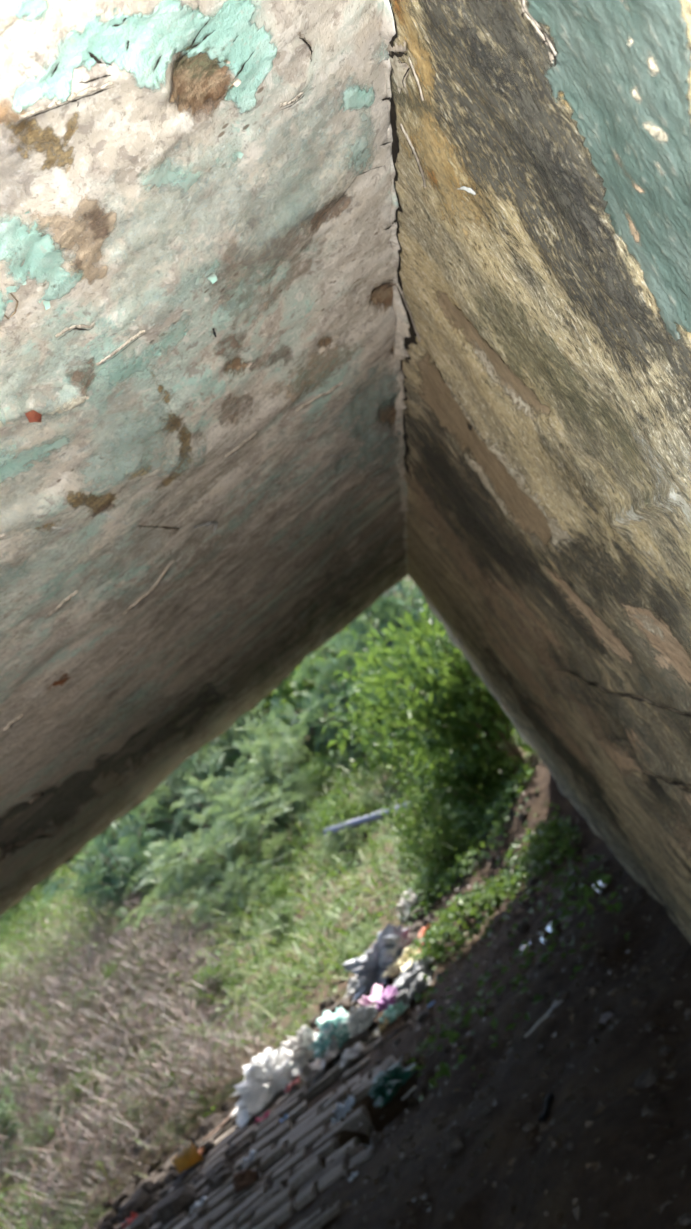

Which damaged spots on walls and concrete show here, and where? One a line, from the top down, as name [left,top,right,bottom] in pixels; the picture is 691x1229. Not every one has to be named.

peeling [13,0,277,119]
crack [280,92,304,110]
crack [299,34,312,61]
peeling [645,124,667,142]
peeling [0,211,82,321]
crack [313,0,426,477]
damp [393,0,691,442]
flaking render [415,353,573,551]
damp [403,408,691,873]
crack [555,668,691,717]
flaking render [621,603,691,688]
crack [606,736,691,792]